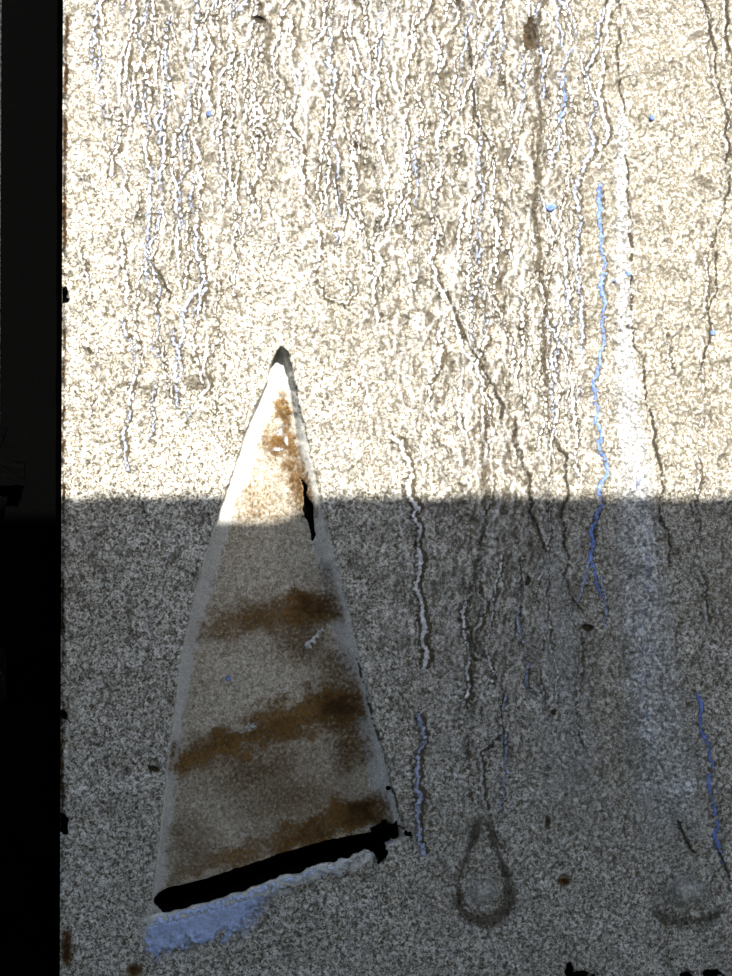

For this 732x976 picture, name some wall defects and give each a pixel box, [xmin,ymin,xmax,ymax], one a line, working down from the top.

leakage [77,238,93,325]
leakage [694,0,732,206]
crack [699,0,732,371]
corrosion [263,392,318,518]
crack [300,478,316,541]
leakage [89,0,723,864]
corrosion [169,565,393,884]
leakage [451,554,518,928]
leakage [650,905,726,929]